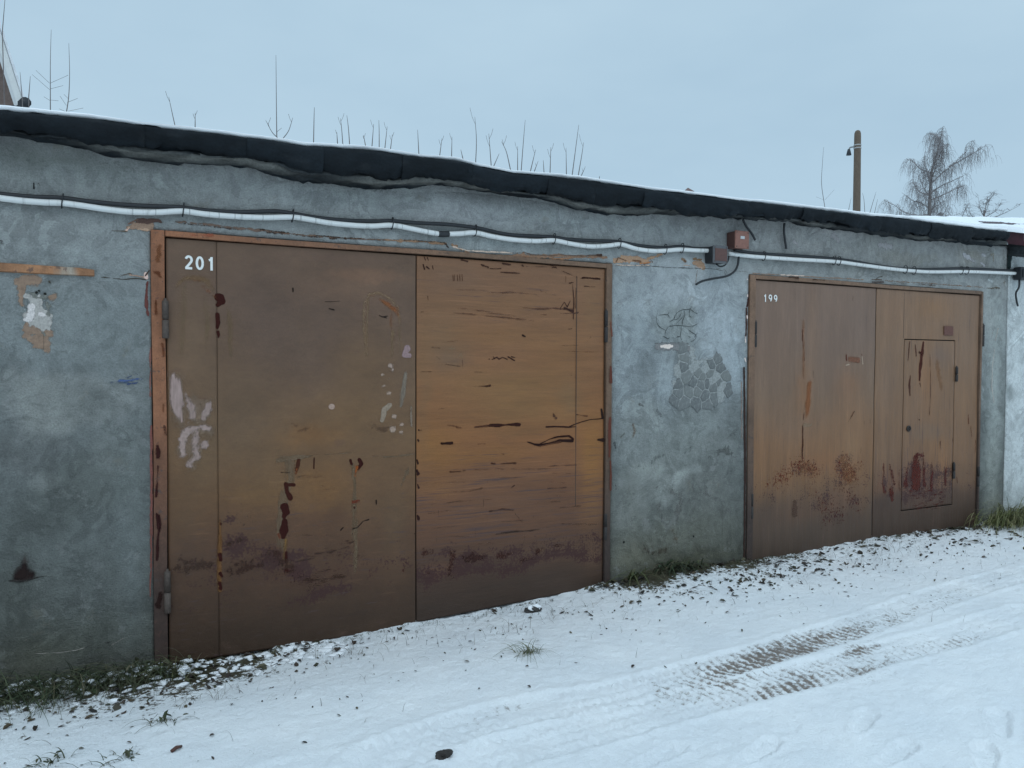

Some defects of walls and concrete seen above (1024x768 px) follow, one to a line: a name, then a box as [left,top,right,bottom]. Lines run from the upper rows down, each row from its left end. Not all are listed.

spalling [14,275,57,353]
rust [882,453,958,510]
rust [217,459,348,592]